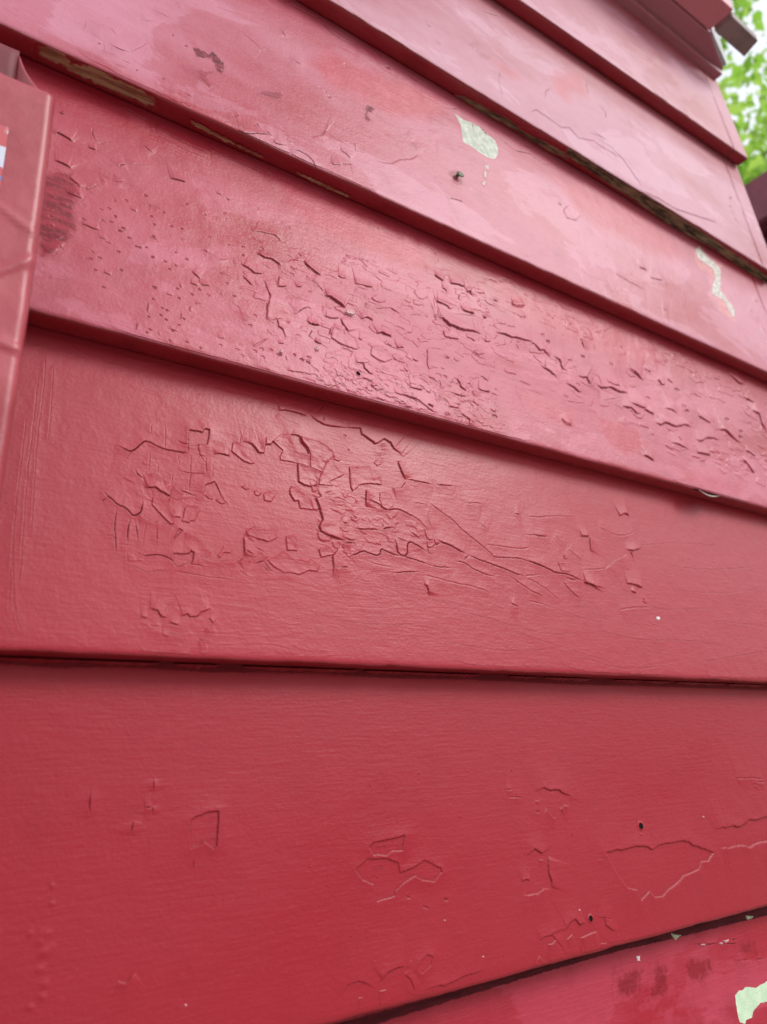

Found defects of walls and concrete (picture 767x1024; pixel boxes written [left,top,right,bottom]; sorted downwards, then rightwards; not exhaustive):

crack [576,269,670,354]
crack [727,260,767,346]
spalling [35,98,767,654]
crack [341,477,767,678]
peeling [735,980,767,1024]